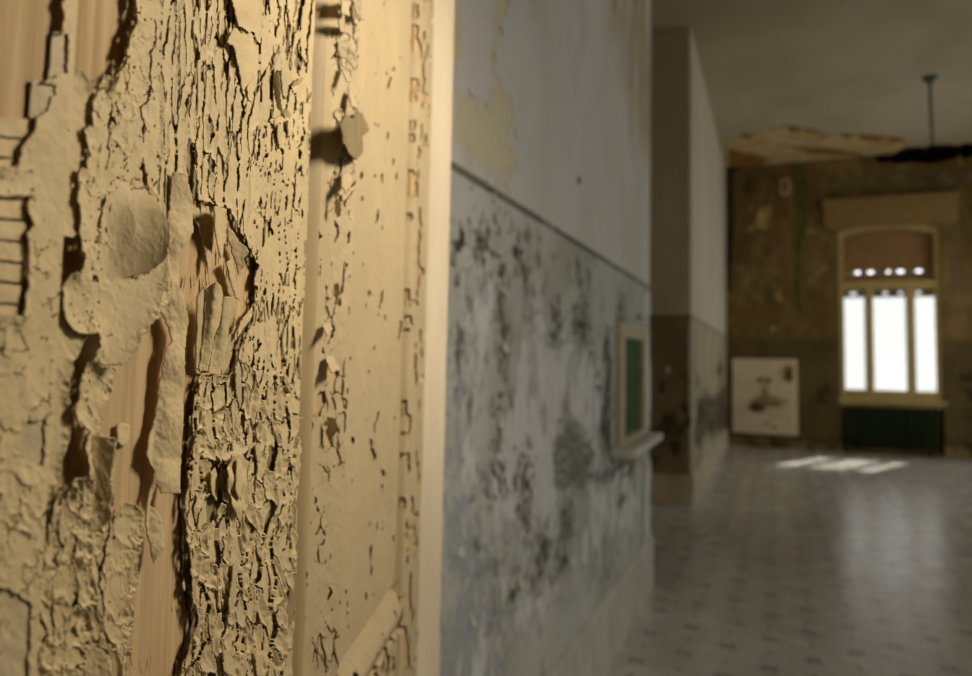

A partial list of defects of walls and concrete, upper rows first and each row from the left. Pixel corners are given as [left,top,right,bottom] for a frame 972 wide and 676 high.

crack [157,0,315,381]
peeling [452,0,521,192]
leakage [451,212,523,287]
peeling [725,126,910,168]
leakage [590,294,643,490]
leakage [652,404,691,464]